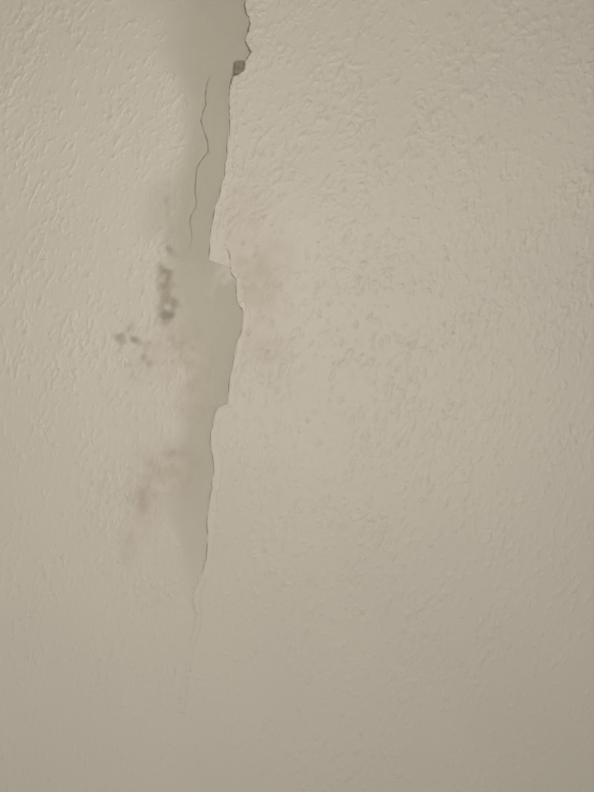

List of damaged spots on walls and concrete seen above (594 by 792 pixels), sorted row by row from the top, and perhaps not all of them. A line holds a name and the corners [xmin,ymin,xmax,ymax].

crack [187,75,243,393]
flaking render [209,0,258,242]
crack [244,2,252,60]
flaking render [178,277,251,714]